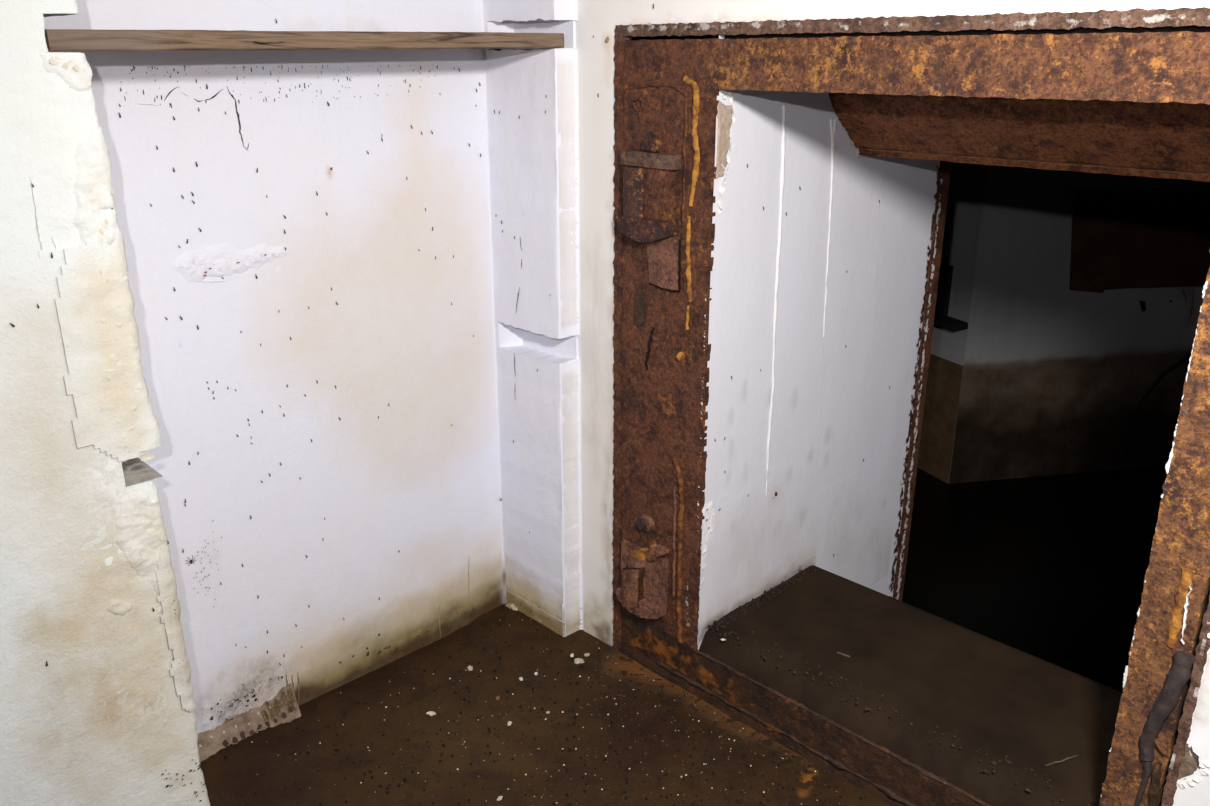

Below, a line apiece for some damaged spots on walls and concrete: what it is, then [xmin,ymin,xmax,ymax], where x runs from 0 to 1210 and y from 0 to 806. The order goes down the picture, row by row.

corrosion [593,0,1210,92]
crack [141,87,249,151]
damp [579,0,852,234]
corrosion [603,146,615,256]
corrosion [1175,286,1201,330]
damp [0,49,614,806]
corrosion [889,166,940,597]
corrosion [595,459,614,599]
corrosion [598,630,822,801]
corrosion [1190,633,1210,729]